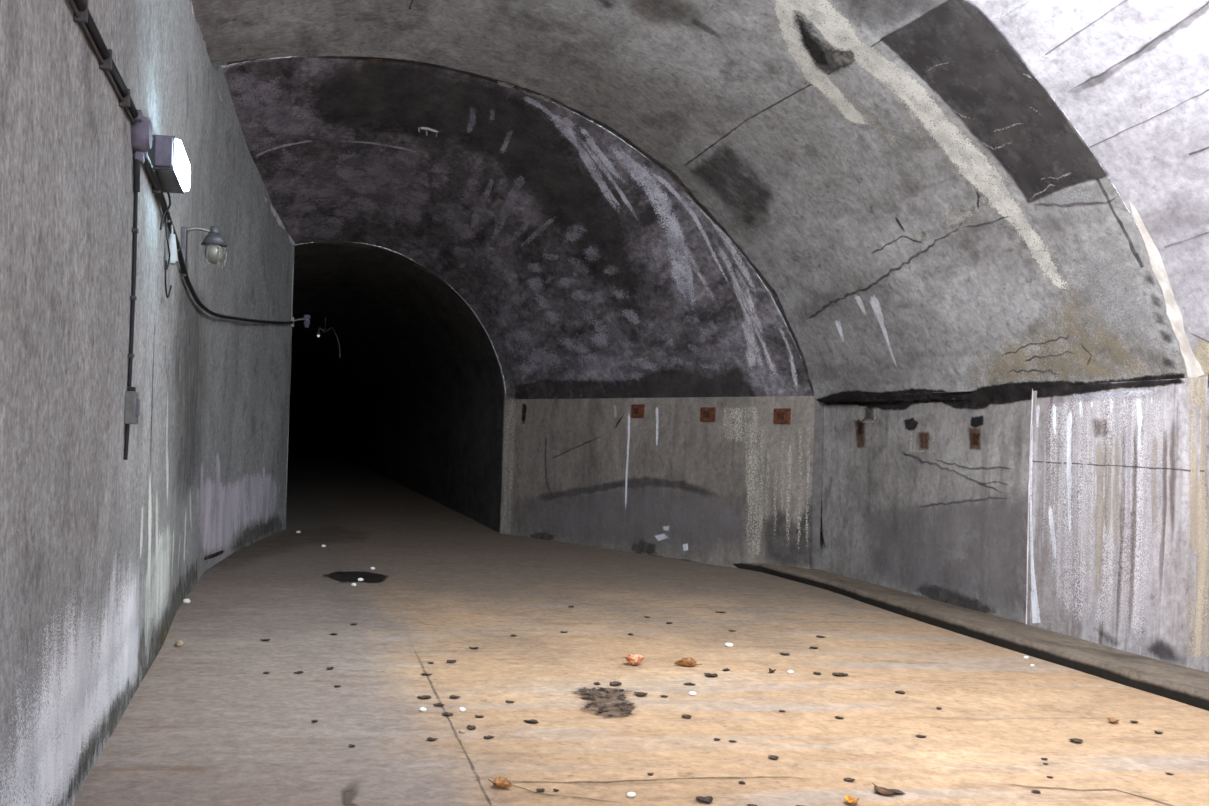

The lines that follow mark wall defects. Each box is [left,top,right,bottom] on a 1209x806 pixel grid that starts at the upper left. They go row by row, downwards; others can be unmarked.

leakage [256,140,320,157]
leakage [524,96,798,392]
spalling [794,12,854,73]
leakage [772,0,1209,657]
leakage [0,295,359,806]
leakage [324,571,387,583]